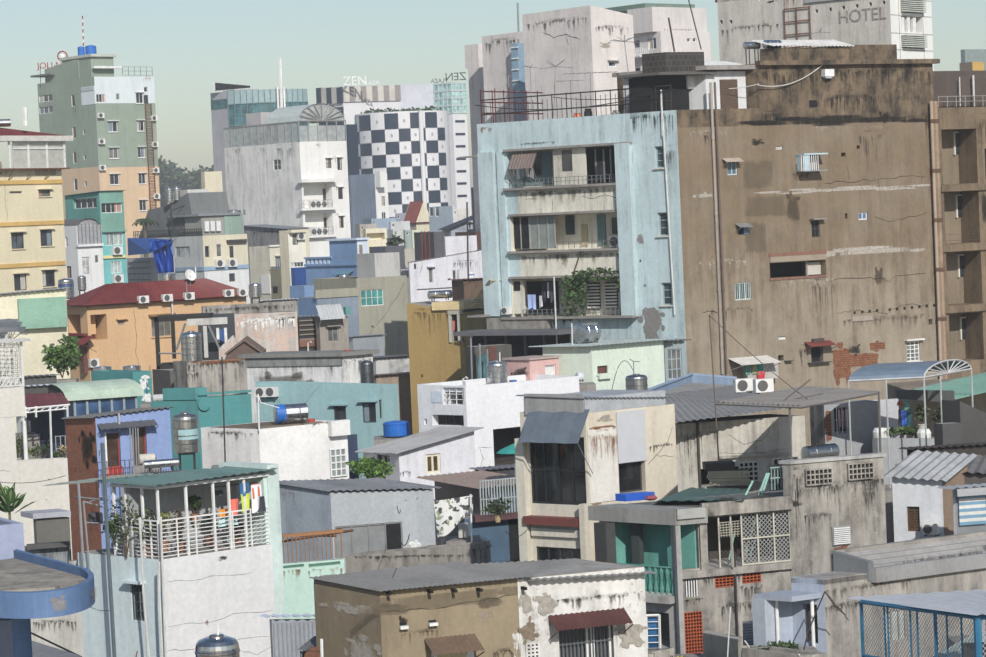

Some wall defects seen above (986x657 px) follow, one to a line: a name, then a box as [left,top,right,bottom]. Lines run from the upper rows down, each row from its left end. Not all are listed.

leakage [740,68,930,128]
flaking render [637,308,665,339]
flaking render [832,340,885,386]
peeling [512,591,558,657]
peeling [614,623,649,648]